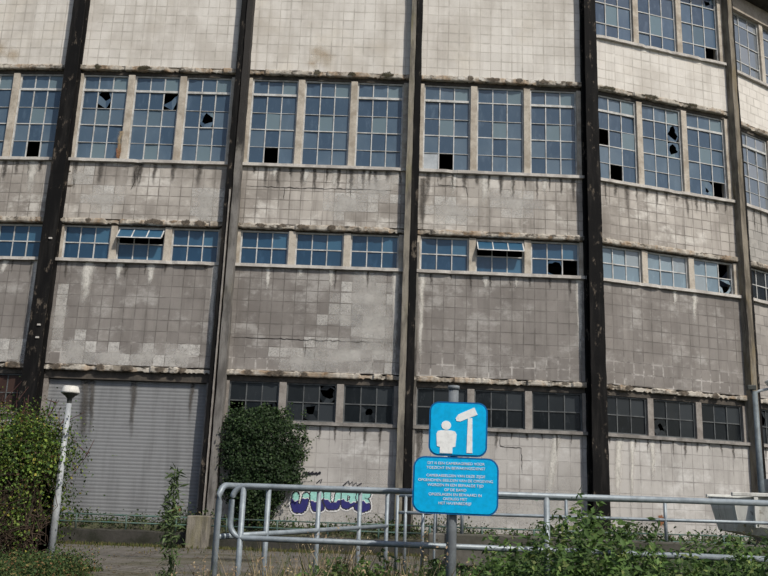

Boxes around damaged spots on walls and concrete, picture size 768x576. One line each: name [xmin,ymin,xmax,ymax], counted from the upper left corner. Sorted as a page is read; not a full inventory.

spalling [458,75,572,85]
water stain [3,160,42,189]
water stain [290,168,316,185]
water stain [350,170,401,186]
water stain [82,262,93,296]
water stain [81,380,95,428]